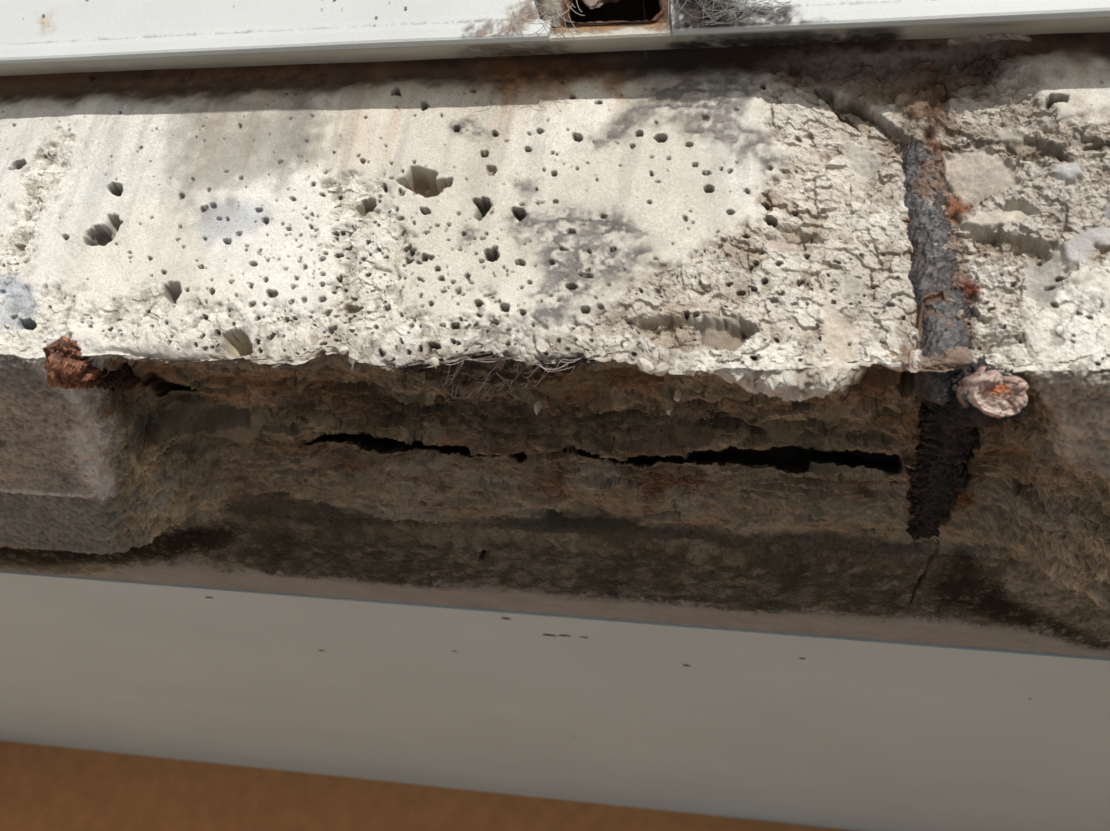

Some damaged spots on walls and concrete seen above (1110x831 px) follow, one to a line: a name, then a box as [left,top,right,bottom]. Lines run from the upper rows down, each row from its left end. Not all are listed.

rust [552,24,621,32]
rust [964,281,978,296]
spalling [42,44,1110,610]
crack [305,432,527,463]
crack [563,410,902,475]
leakage [485,517,772,544]